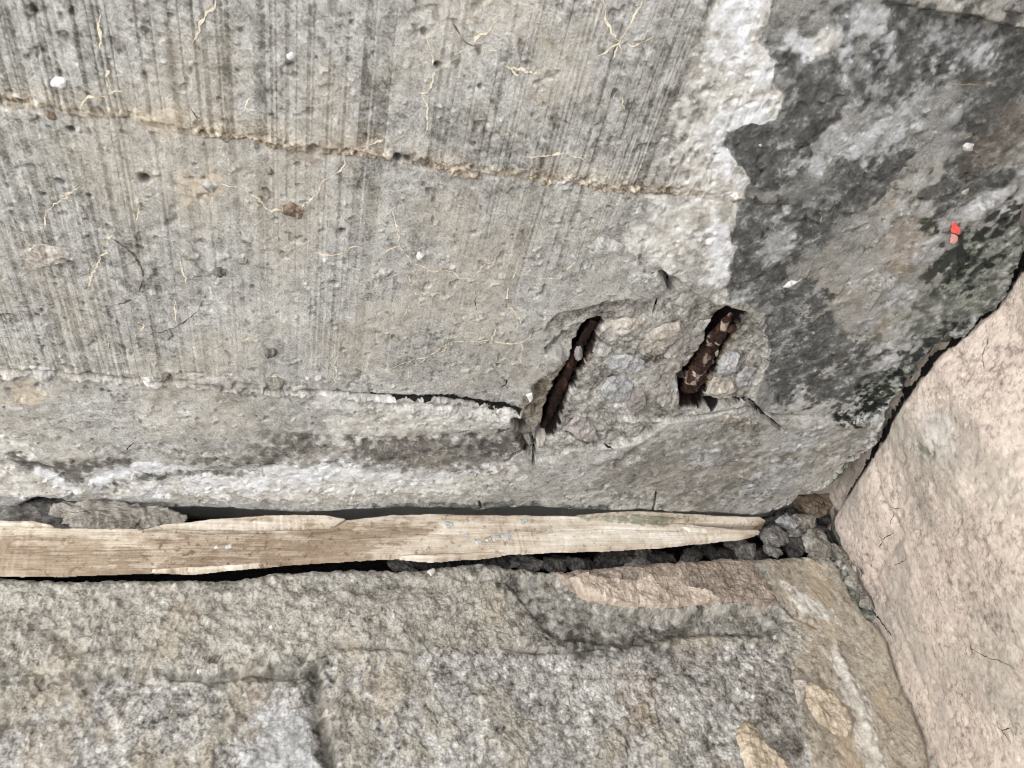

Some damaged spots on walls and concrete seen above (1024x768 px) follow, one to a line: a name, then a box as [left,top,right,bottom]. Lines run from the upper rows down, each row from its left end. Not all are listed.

crack [370,208,551,467]
spalling [513,269,768,464]
water stain [625,0,1024,429]